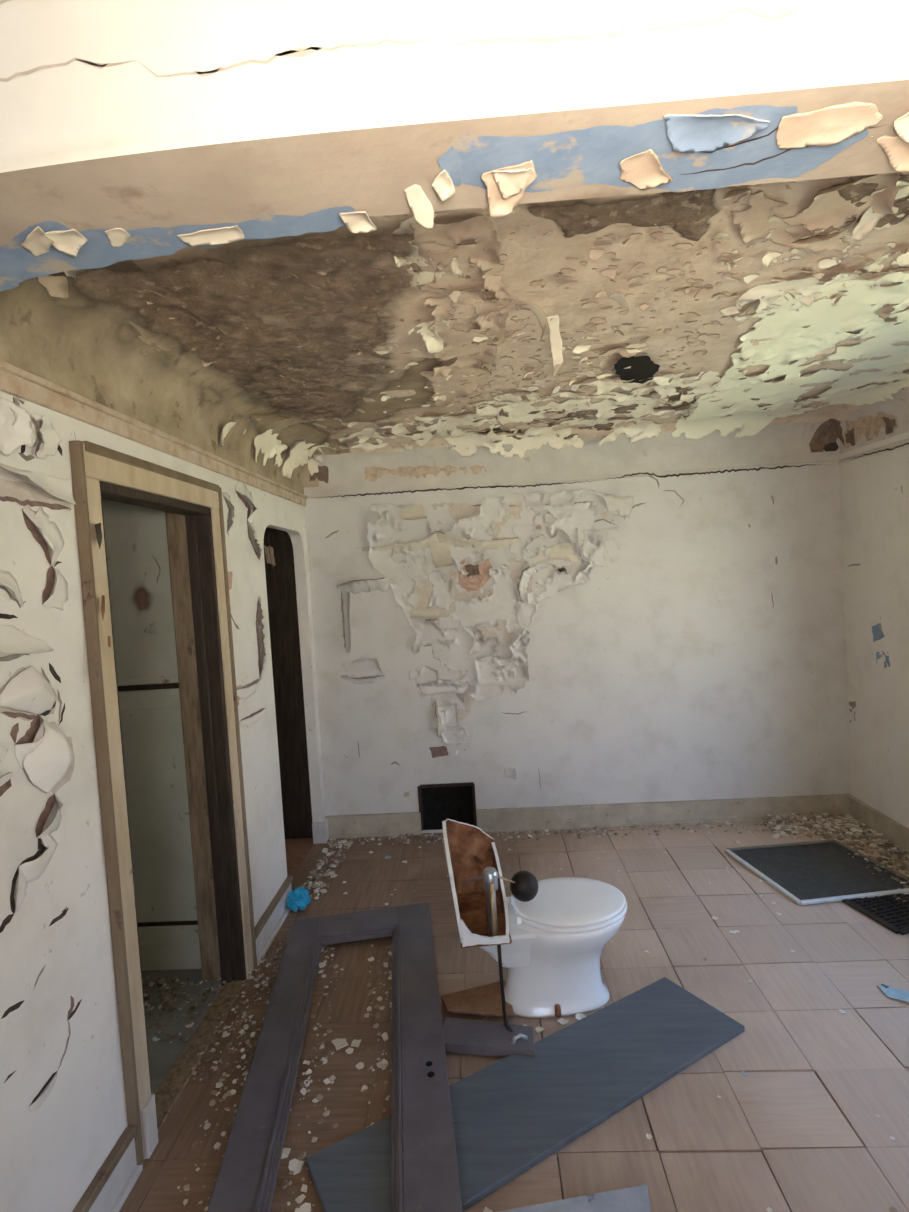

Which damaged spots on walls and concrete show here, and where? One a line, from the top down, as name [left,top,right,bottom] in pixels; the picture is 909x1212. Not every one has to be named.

crack [0,7,832,82]
damp [48,272,94,308]
flaking render [0,101,909,483]
peeling [0,397,77,511]
damp [249,358,442,451]
peeling [223,481,275,570]
peeling [0,625,75,797]
peeling [236,596,266,728]
peeling [337,489,634,758]